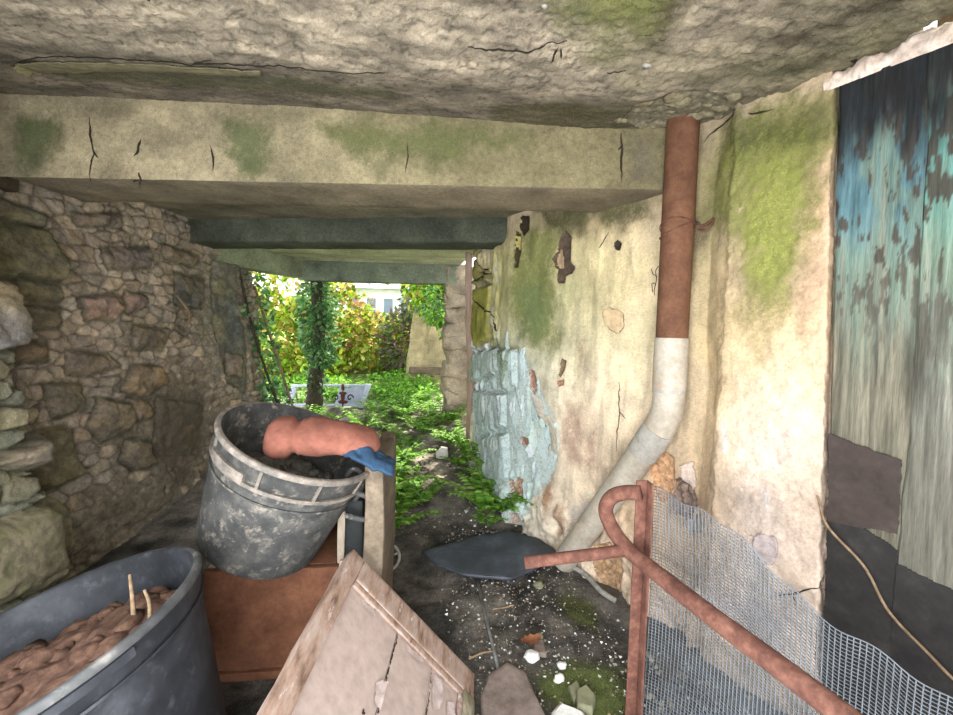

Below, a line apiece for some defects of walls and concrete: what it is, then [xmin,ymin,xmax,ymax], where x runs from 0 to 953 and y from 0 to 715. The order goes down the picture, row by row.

crack [467,41,567,64]
crack [89,117,98,182]
crack [616,131,624,183]
spalling [552,230,575,283]
damp [748,164,799,287]
peeling [471,331,559,524]
spalling [650,452,702,536]